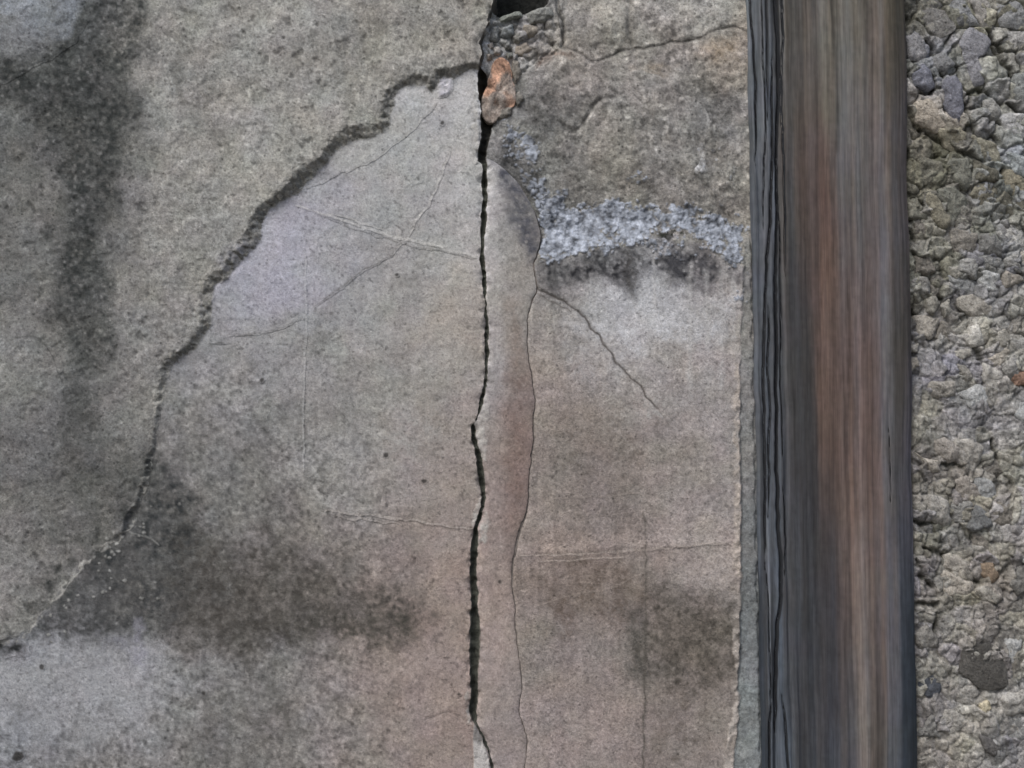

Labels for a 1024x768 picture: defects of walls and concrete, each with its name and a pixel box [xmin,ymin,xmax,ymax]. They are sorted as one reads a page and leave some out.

damp [0,0,465,768]
crack [208,0,497,768]
flaking render [3,0,751,644]
crack [511,191,673,768]
damp [486,66,751,768]
crack [540,0,747,69]
flaking render [722,608,742,768]